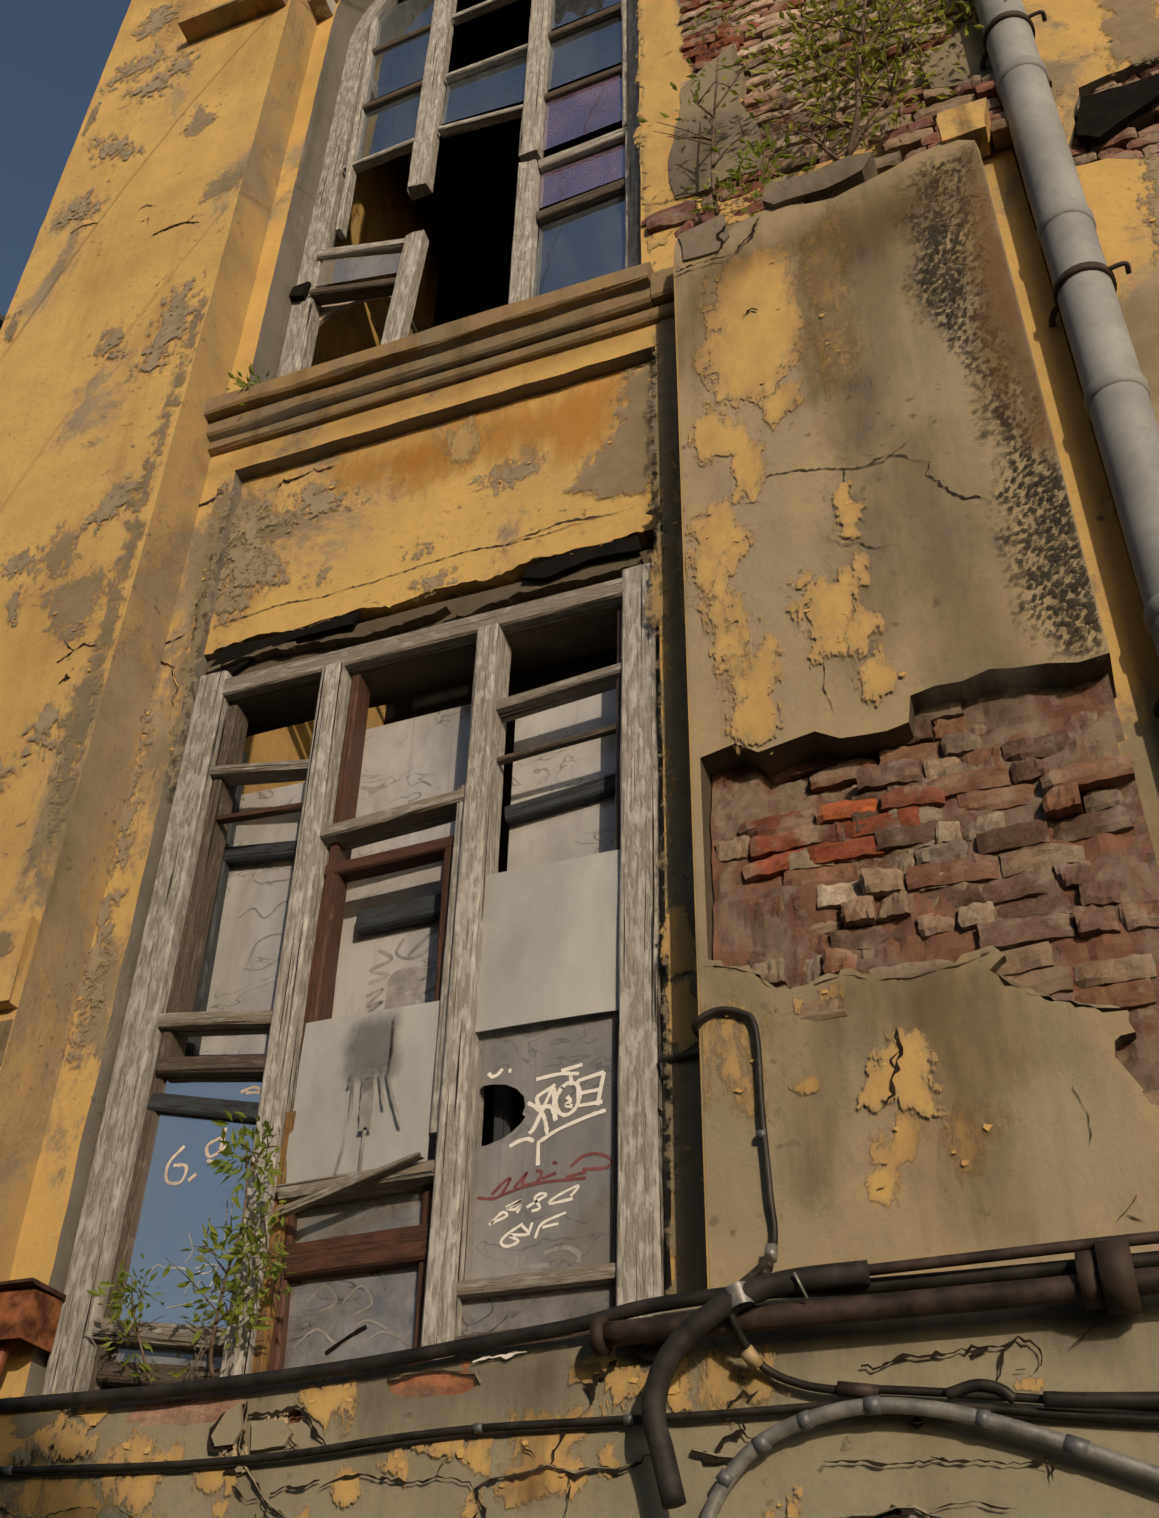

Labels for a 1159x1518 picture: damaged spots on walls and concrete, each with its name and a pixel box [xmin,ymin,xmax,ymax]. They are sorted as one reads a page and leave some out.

flaking render [678,0,979,179]
spalling [1070,0,1159,265]
damp [896,146,1103,655]
peeling [0,270,209,842]
flaking render [62,316,1159,1295]
flaking render [125,1390,246,1426]
crack [208,1360,651,1518]
flaking render [386,1350,527,1397]
crack [690,1389,763,1463]
crack [840,1501,1017,1518]
crack [824,1456,1055,1480]
crack [861,1325,1095,1381]